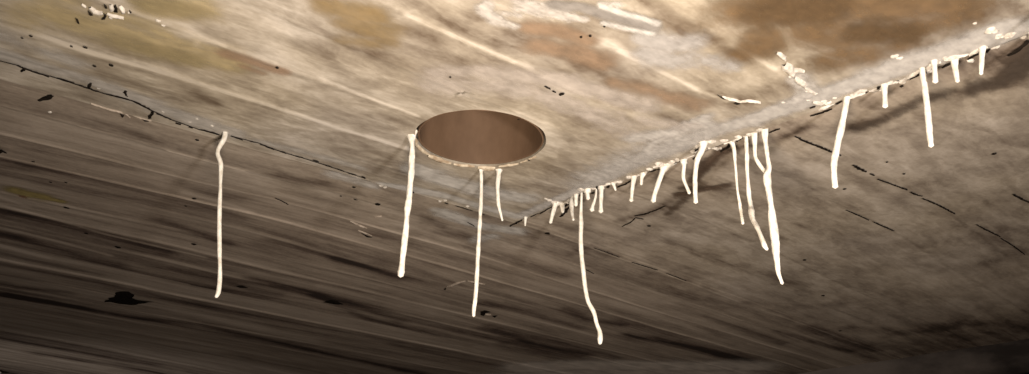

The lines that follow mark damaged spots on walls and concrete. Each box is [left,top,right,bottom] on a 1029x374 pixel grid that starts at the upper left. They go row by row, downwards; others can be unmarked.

leakage [22,0,244,70]
leakage [476,0,737,70]
leakage [0,50,243,138]
crack [0,61,366,179]
leakage [258,19,1029,241]
crack [769,40,1029,214]
crack [510,138,743,227]
crack [977,225,1025,255]